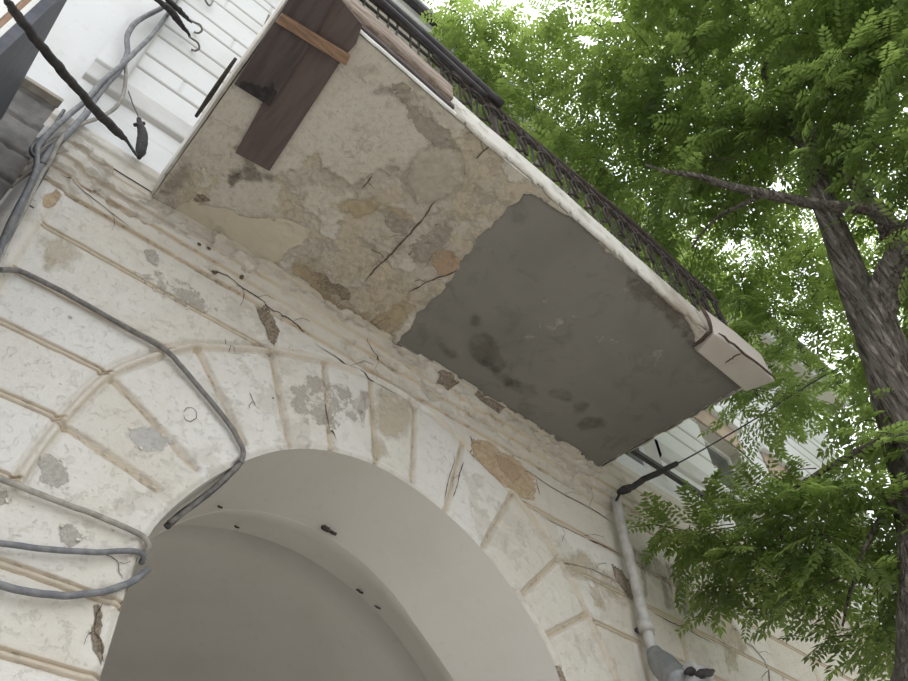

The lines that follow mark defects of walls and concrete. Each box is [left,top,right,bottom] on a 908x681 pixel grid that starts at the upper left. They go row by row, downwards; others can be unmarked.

peeling [392,82,457,152]
peeling [41,189,62,208]
crack [366,201,436,280]
crack [408,253,458,293]
spalling [256,305,280,345]
crack [208,268,397,400]
crack [693,302,776,379]
peeling [288,376,357,432]
spalling [437,370,459,390]
peeling [38,453,70,488]
peeling [471,439,536,500]
spalling [88,605,105,665]